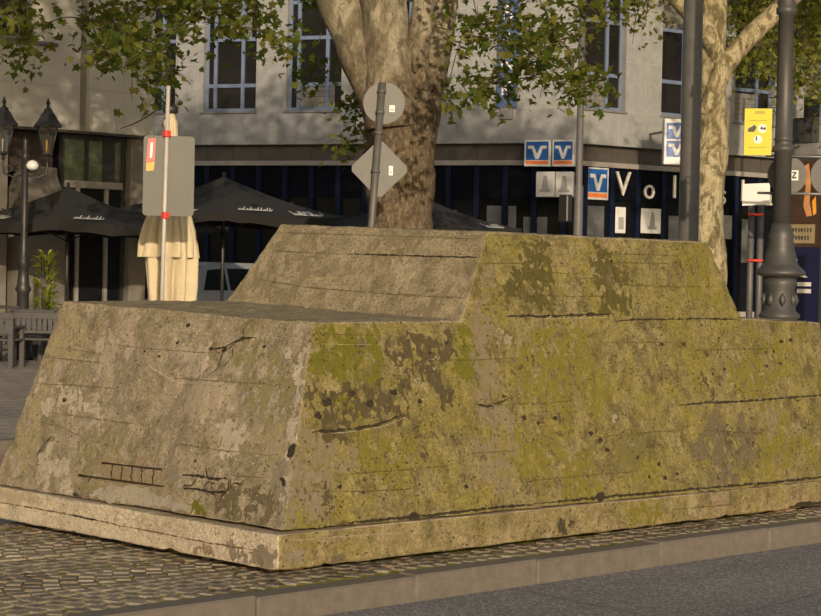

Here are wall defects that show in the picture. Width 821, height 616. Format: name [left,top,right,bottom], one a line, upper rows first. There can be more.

damp [499,238,555,318]
damp [587,238,634,324]
crack [203,322,256,378]
damp [384,328,458,412]
crack [312,415,401,433]
damp [691,391,783,491]
crack [182,468,262,499]